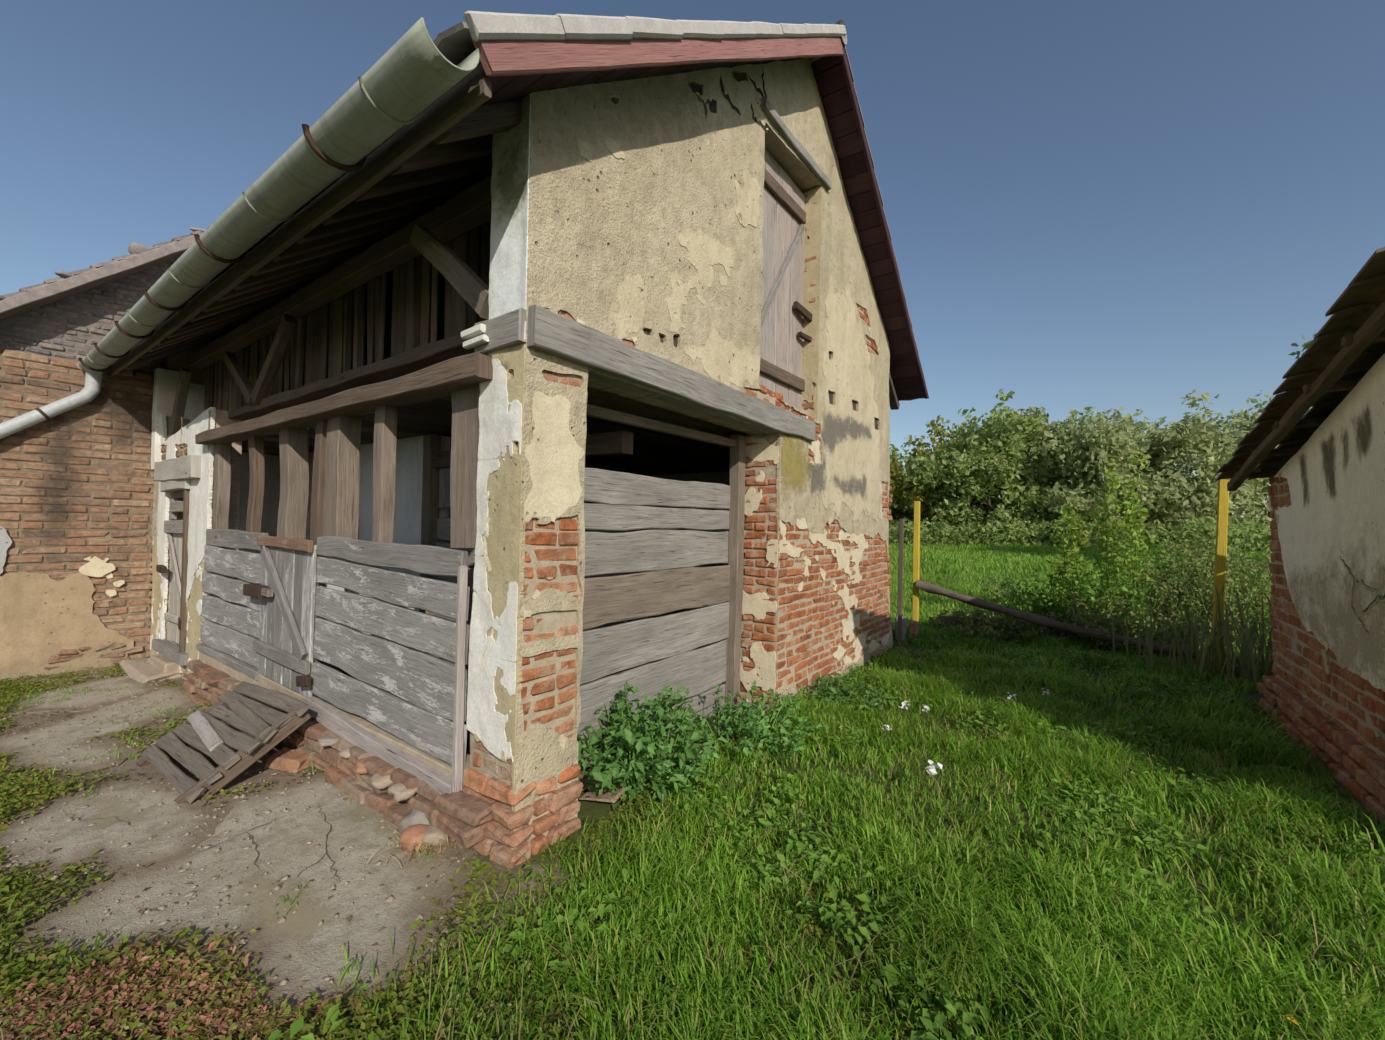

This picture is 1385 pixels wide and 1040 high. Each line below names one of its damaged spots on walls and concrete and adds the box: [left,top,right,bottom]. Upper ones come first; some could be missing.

crack [696,68,768,133]
peeling [734,170,762,227]
spalling [613,186,893,713]
water stain [1299,456,1309,502]
water stain [1321,408,1371,497]
peeling [0,526,163,679]
peeling [466,359,585,783]
spalling [1268,473,1385,761]
water stain [1291,561,1385,676]